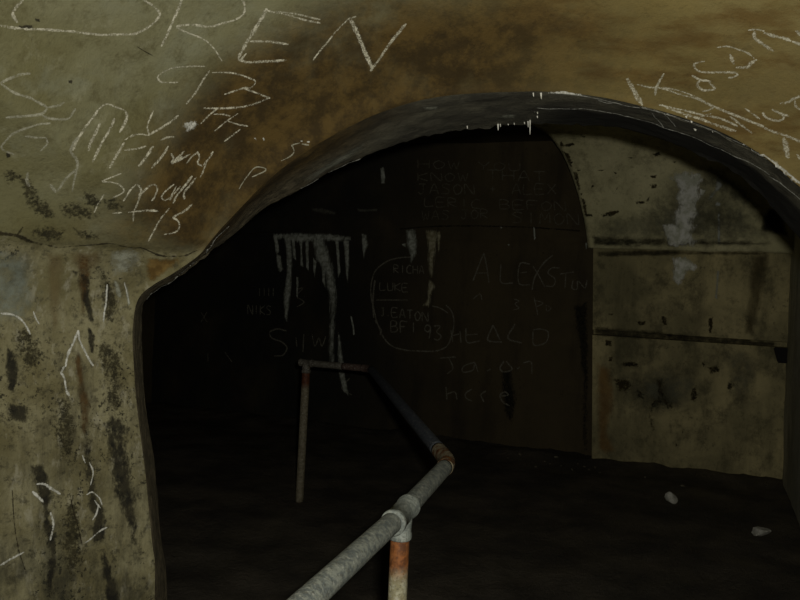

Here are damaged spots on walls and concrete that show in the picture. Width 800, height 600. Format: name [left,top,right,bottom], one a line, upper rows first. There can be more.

leakage [644,172,745,247]
leakage [103,281,130,322]
leakage [274,234,351,395]
leakage [425,230,440,306]
leakage [673,257,697,284]
leakage [6,349,18,390]
leakage [60,330,94,396]
leakage [10,404,27,422]
leakage [32,466,61,593]
leakage [86,447,106,542]
leakage [104,417,137,544]
leakage [101,554,120,600]